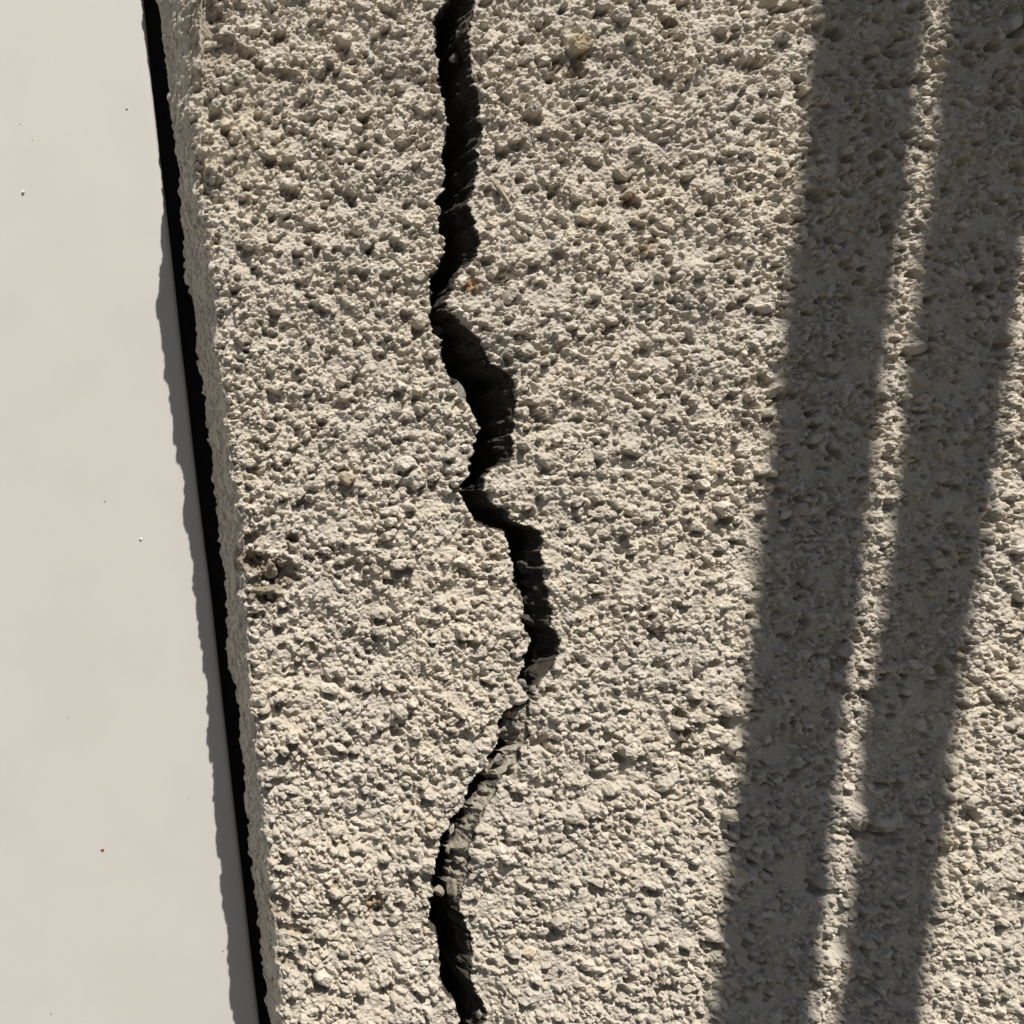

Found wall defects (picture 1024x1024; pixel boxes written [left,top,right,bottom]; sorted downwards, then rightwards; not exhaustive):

crack [427,0,561,1024]